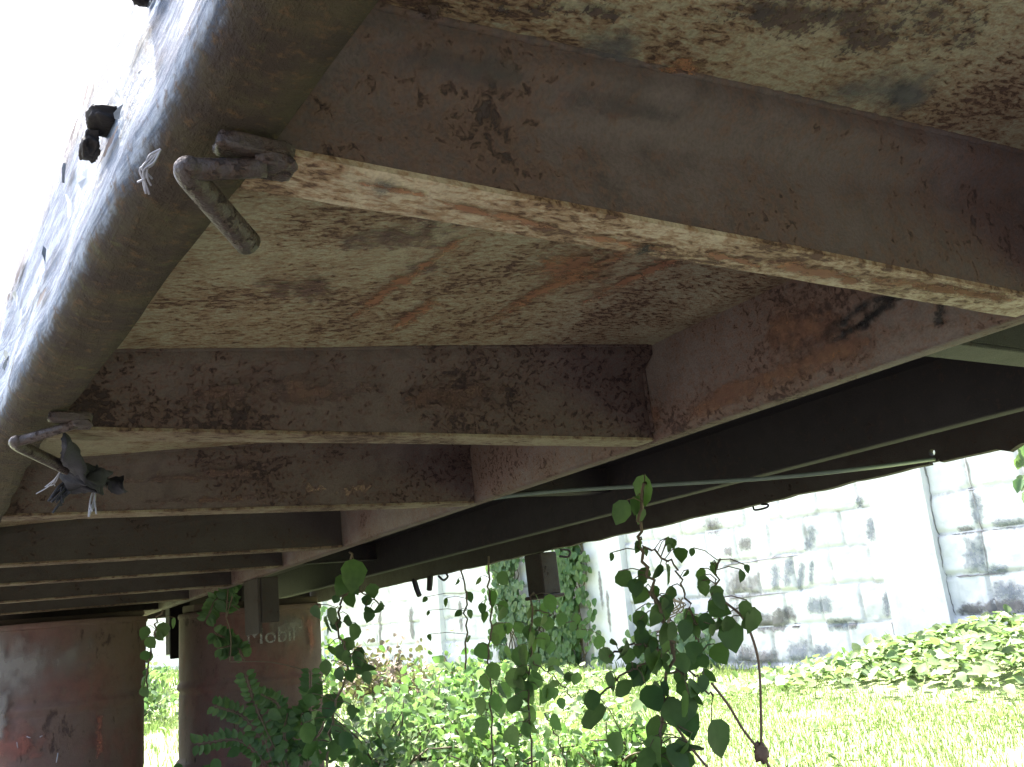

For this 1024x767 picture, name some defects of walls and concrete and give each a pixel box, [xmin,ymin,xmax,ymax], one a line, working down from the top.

rust [343,217,460,251]
damp [958,495,1021,598]
damp [724,539,761,622]
damp [772,560,813,590]
damp [808,599,858,630]
damp [739,648,776,665]
damp [789,641,828,661]